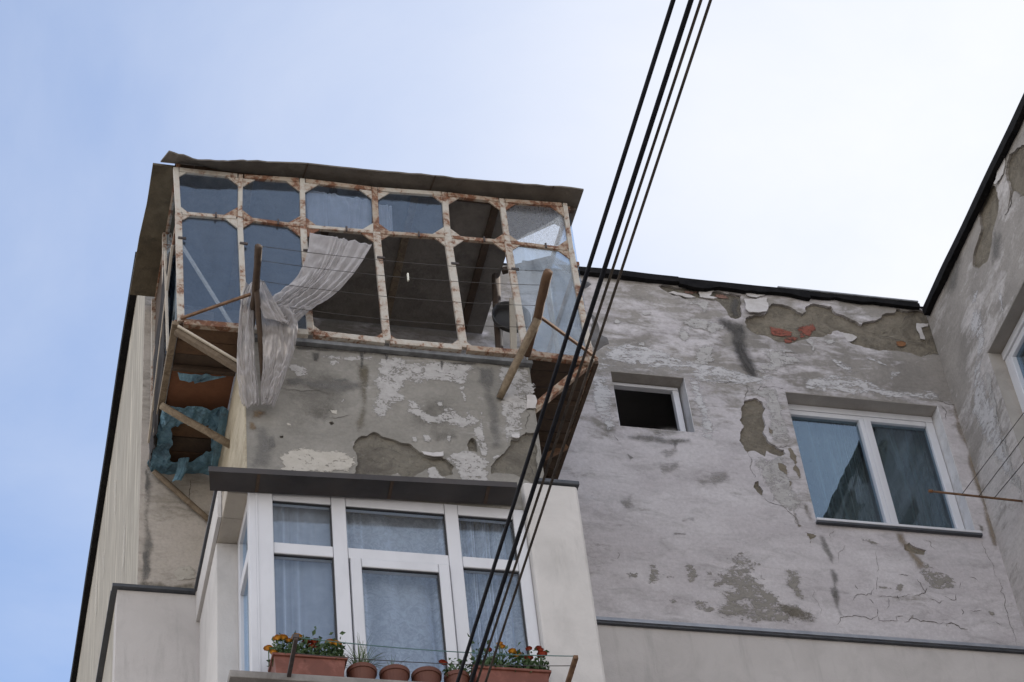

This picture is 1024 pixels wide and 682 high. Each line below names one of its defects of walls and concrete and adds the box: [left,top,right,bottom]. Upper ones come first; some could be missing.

spalling [975,147,1024,268]
water stain [720,298,755,375]
spalling [592,286,938,439]
spalling [280,355,537,484]
spalling [739,400,801,485]
peeling [684,553,815,623]
crack [813,547,1017,645]